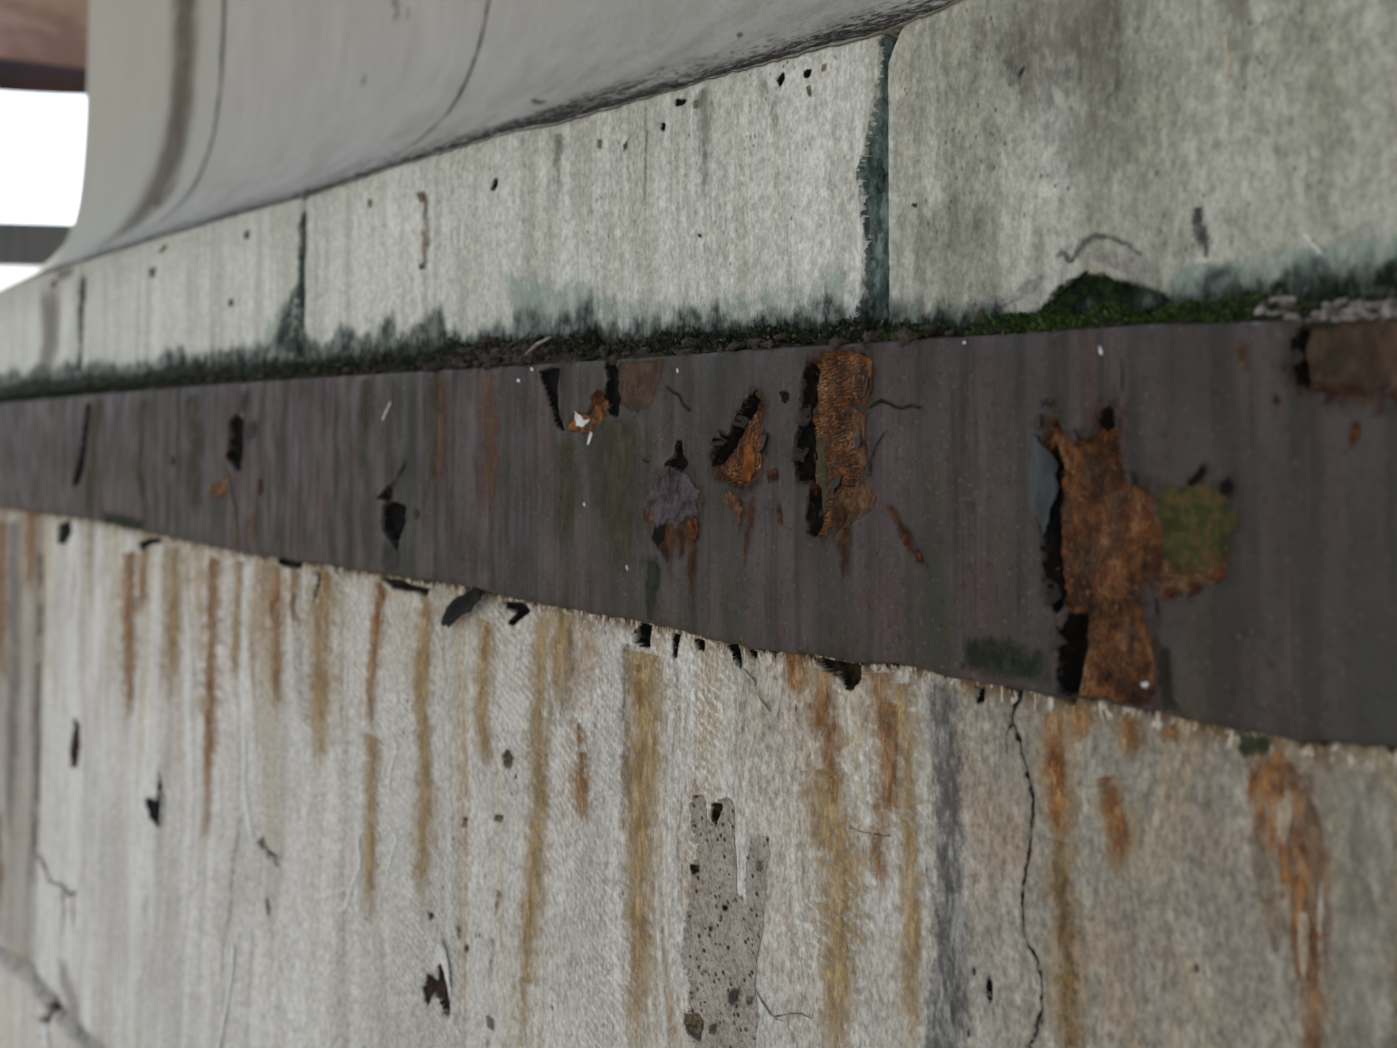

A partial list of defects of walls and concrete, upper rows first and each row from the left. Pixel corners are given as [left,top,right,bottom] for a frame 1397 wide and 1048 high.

rust [539,360,663,445]
rust [644,463,704,621]
rust [709,347,927,574]
rust [1282,321,1397,417]
spalling [145,773,164,826]
spalling [423,927,469,1015]
peeling [680,795,770,1048]
water stain [925,683,973,1048]
crack [1006,690,1043,1048]
rust [1028,399,1243,1048]